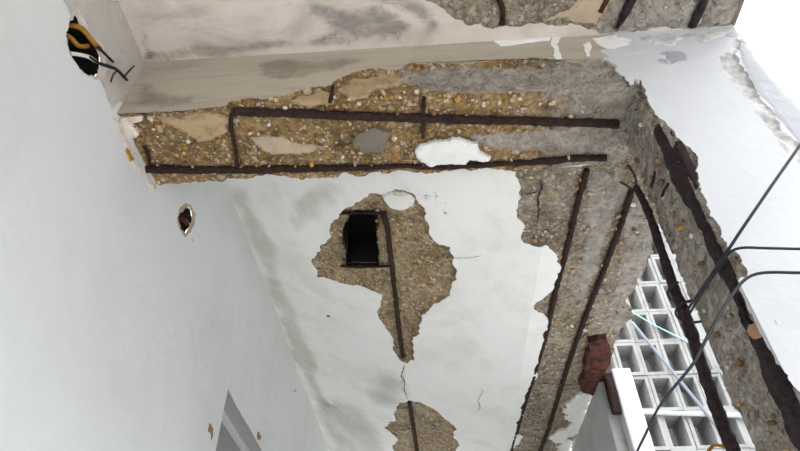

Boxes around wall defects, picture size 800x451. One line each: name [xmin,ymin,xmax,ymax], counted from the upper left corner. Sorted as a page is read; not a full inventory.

spalling [426,0,800,164]
spalling [112,57,800,451]
rust [603,373,622,415]